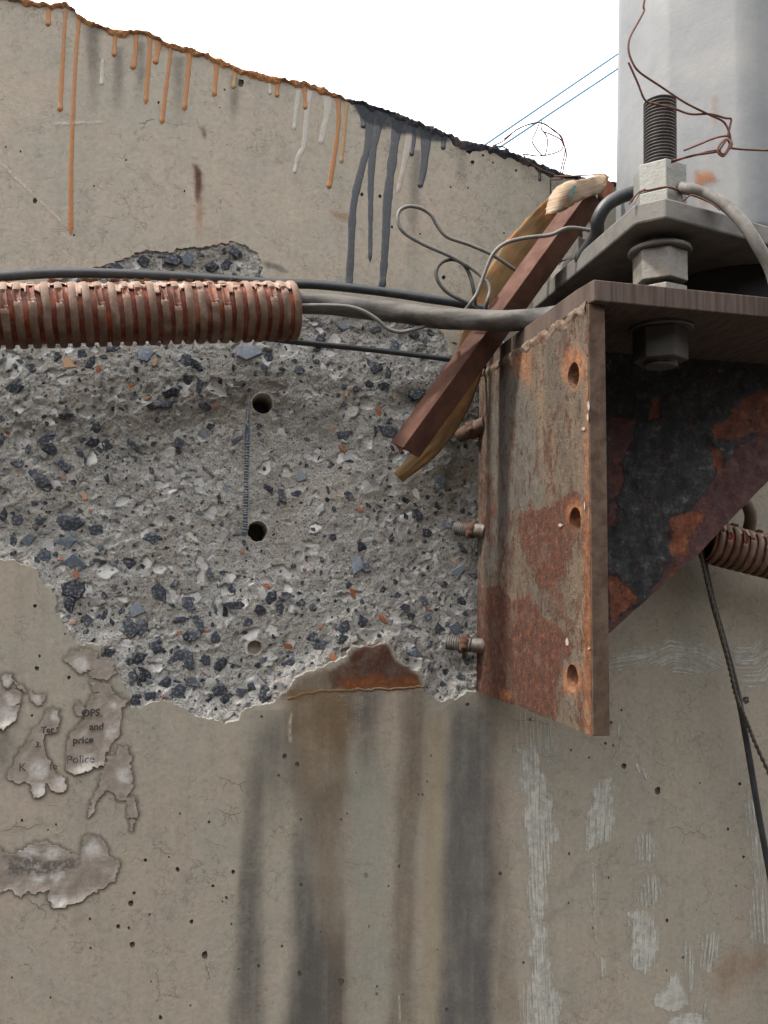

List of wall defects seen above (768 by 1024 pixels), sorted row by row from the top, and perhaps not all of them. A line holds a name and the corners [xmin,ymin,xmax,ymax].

spalling [48,241,262,284]
spalling [0,314,479,724]
rust [291,645,419,693]
damp [441,717,493,1024]